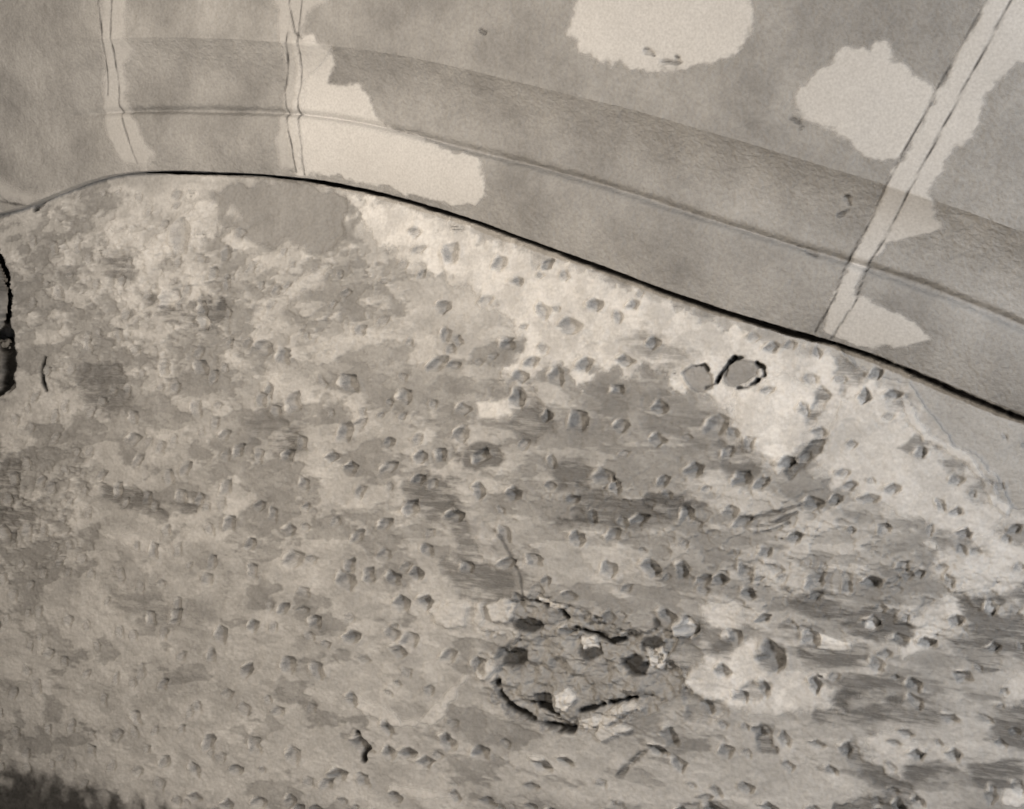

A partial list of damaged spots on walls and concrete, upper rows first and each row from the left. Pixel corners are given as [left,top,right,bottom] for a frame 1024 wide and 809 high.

spalling [0,253,17,397]
spalling [683,356,766,391]
peeling [457,443,502,470]
spalling [786,393,830,474]
peeling [546,457,691,537]
spalling [754,498,806,535]
spalling [469,591,697,741]
peeling [712,632,732,654]
peeling [782,579,947,723]
peeling [950,597,1024,654]
peeling [833,743,948,809]
peeling [970,707,1024,790]